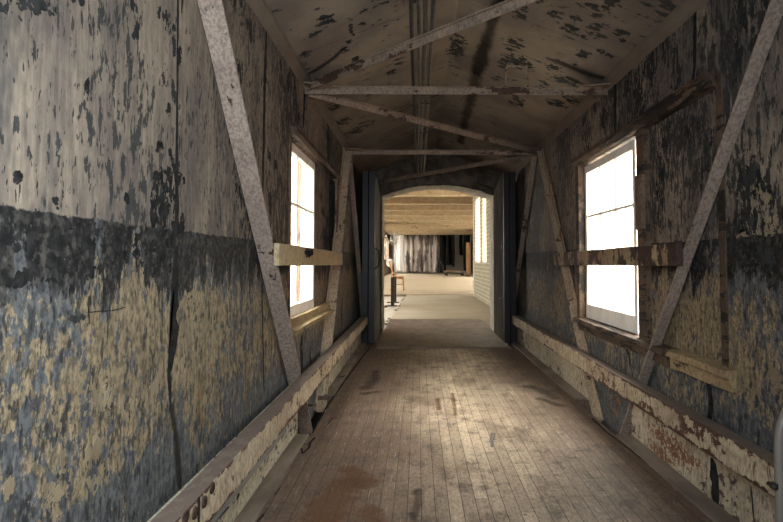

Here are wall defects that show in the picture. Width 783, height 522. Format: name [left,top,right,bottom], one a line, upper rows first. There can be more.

peeling [0,0,58,22]
peeling [130,0,140,40]
peeling [157,6,182,67]
peeling [304,13,337,40]
peeling [341,0,391,72]
peeling [446,33,469,61]
peeling [497,37,562,72]
peeling [547,0,631,66]
peeling [161,63,177,113]
peeling [546,95,583,110]
peeling [0,140,185,289]
peeling [232,158,250,241]